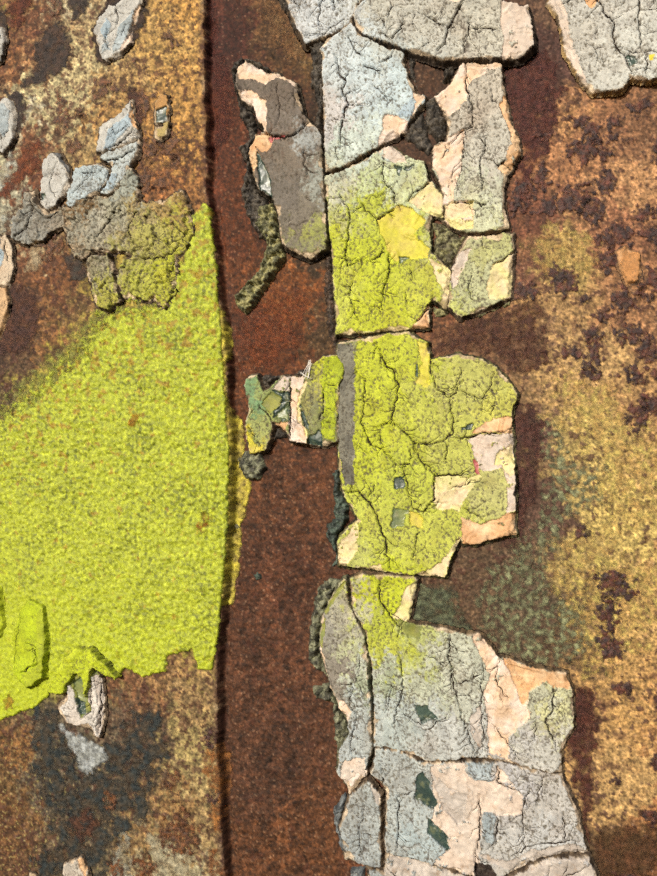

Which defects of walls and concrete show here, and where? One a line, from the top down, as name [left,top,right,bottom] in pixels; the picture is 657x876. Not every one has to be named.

peeling [93,0,146,65]
peeling [545,0,657,99]
peeling [0,93,196,342]
corrosion [503,50,657,275]
corrosion [432,261,591,372]
corrosion [560,265,657,435]
peeling [231,0,600,876]
corrosion [506,403,545,548]
peeling [0,586,123,738]
corrosion [592,565,641,664]
corrosion [568,686,657,876]
peeling [62,853,93,876]